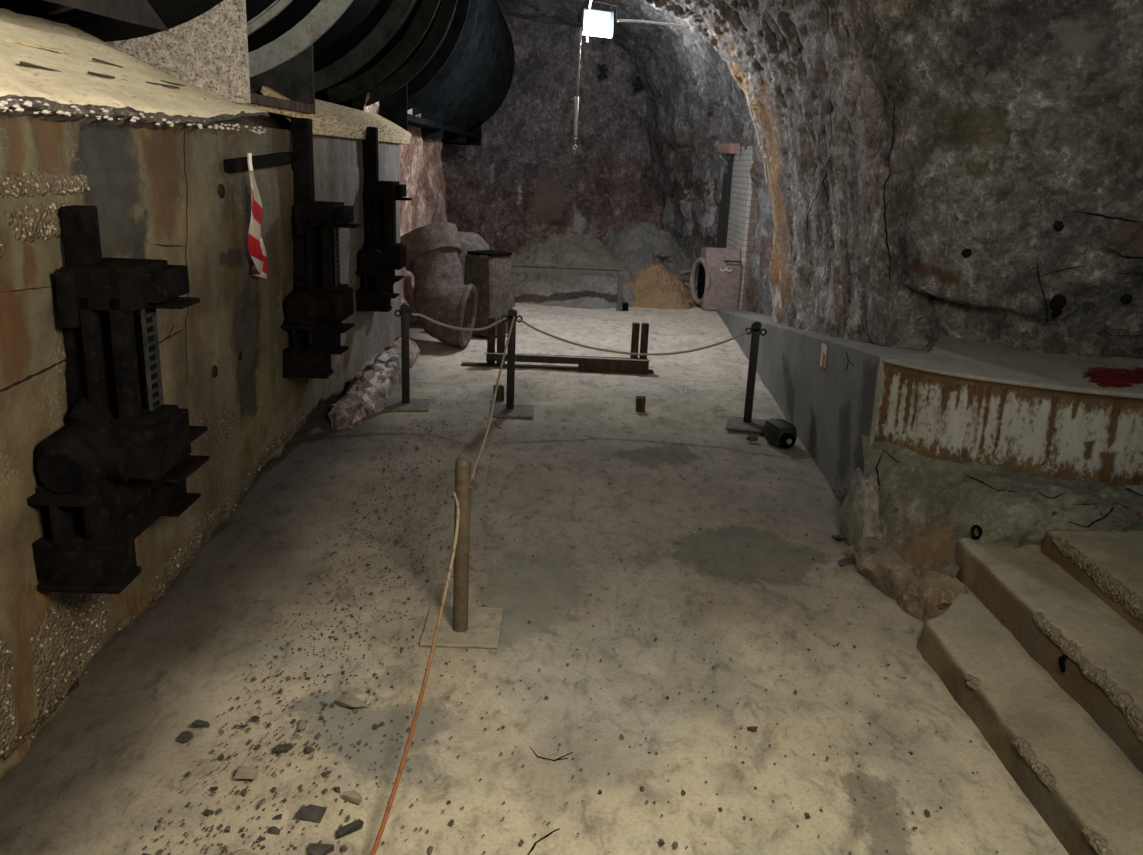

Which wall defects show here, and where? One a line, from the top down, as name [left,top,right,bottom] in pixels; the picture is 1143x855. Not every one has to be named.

spalling [0,94,269,259]
crack [0,359,67,392]
corrosion [878,371,1007,450]
corrosion [1043,396,1059,465]
corrosion [1084,398,1143,485]
spalling [1051,535,1143,621]
spalling [0,633,17,763]
spalling [30,593,109,726]
spalling [1032,611,1143,742]
spalling [1010,737,1058,792]
spalling [1081,826,1114,855]